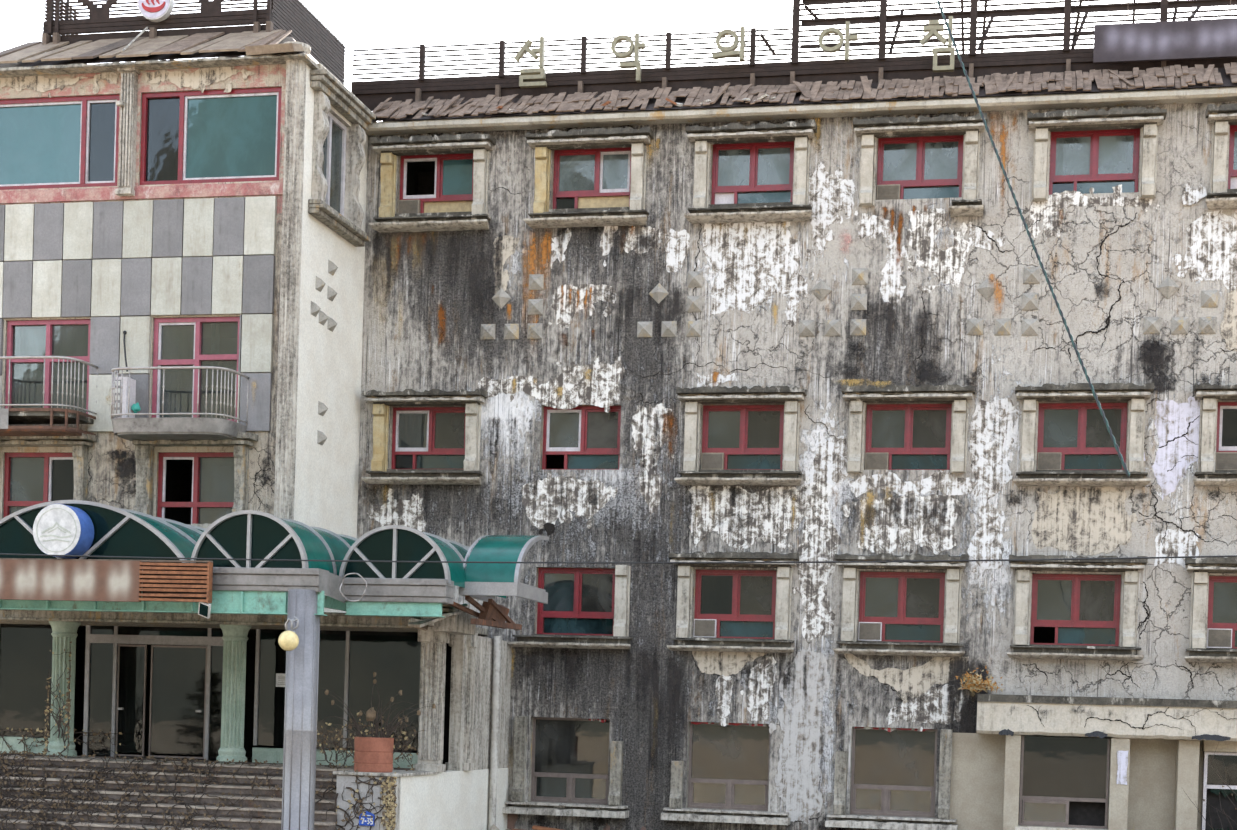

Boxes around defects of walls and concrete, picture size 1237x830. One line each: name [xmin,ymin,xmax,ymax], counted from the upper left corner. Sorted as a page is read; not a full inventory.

corrosion [991,115,1016,192]
corrosion [437,304,445,342]
corrosion [507,234,551,319]
peeling [477,356,625,413]
peeling [600,161,1005,327]
damp [912,310,983,388]
crack [1038,213,1137,363]
damp [1138,338,1178,393]
crack [1138,415,1236,550]
peeling [688,398,1021,825]
crack [1077,582,1236,734]
damp [590,817,605,830]